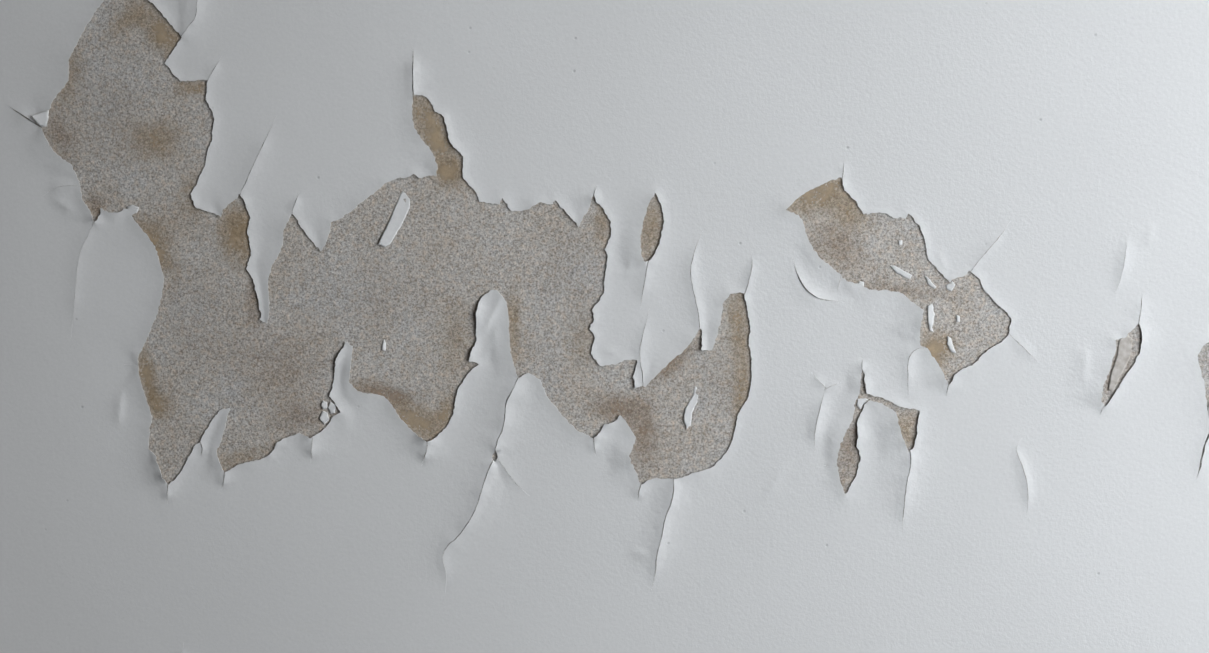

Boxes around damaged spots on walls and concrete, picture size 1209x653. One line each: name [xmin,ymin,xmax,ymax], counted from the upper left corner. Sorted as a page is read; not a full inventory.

peeling [0,0,767,602]
peeling [771,151,1048,543]
peeling [1089,283,1155,426]
peeling [1181,327,1209,493]